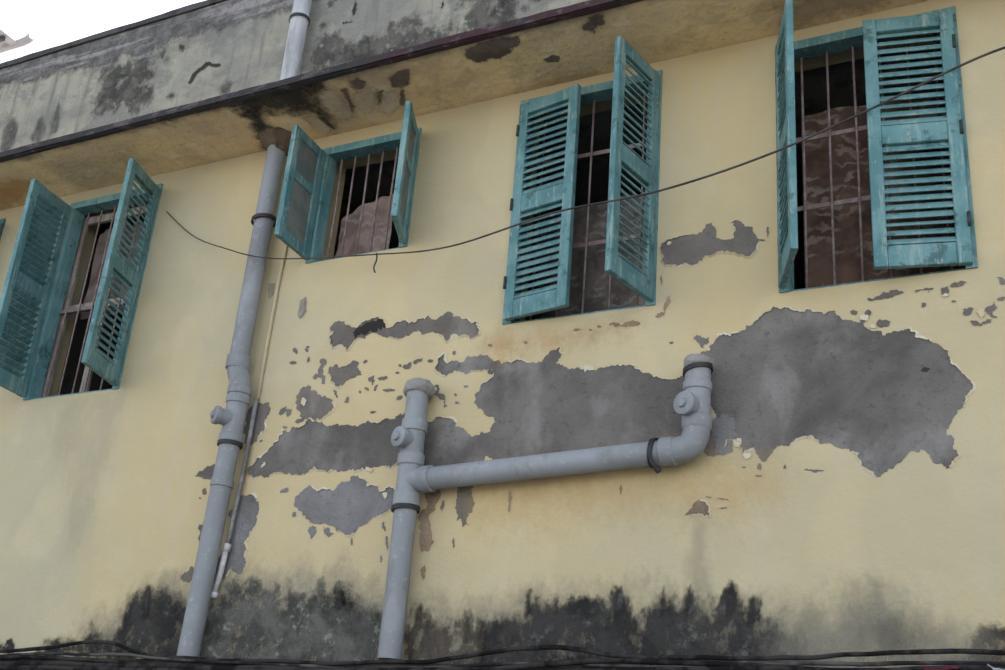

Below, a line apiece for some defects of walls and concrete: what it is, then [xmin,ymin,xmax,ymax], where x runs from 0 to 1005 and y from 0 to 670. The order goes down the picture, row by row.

water stain [91,55,154,114]
crack [180,45,220,84]
water stain [219,82,335,150]
water stain [311,15,452,71]
spalling [465,36,520,63]
spalling [658,219,769,285]
spalling [693,281,1005,478]
spalling [243,312,685,563]
spalling [214,492,259,592]
water stain [199,580,382,662]
water stain [404,582,807,666]
water stain [968,626,1005,662]